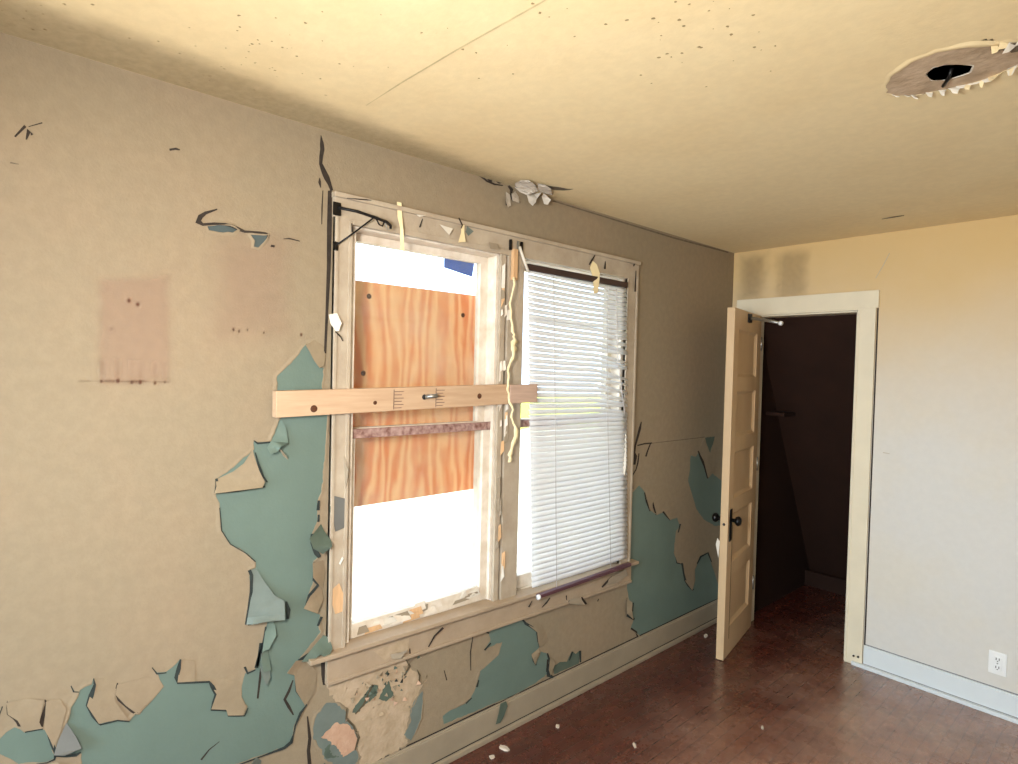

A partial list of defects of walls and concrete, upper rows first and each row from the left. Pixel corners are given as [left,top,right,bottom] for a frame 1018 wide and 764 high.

peeling [991,42,1018,54]
peeling [893,65,1017,99]
peeling [195,209,300,250]
crack [318,136,333,353]
peeling [589,255,606,293]
peeling [329,313,343,341]
peeling [272,340,327,391]
peeling [495,477,505,582]
peeling [601,435,722,637]
peeling [0,415,428,764]
peeling [357,587,480,635]
peeling [441,598,581,727]